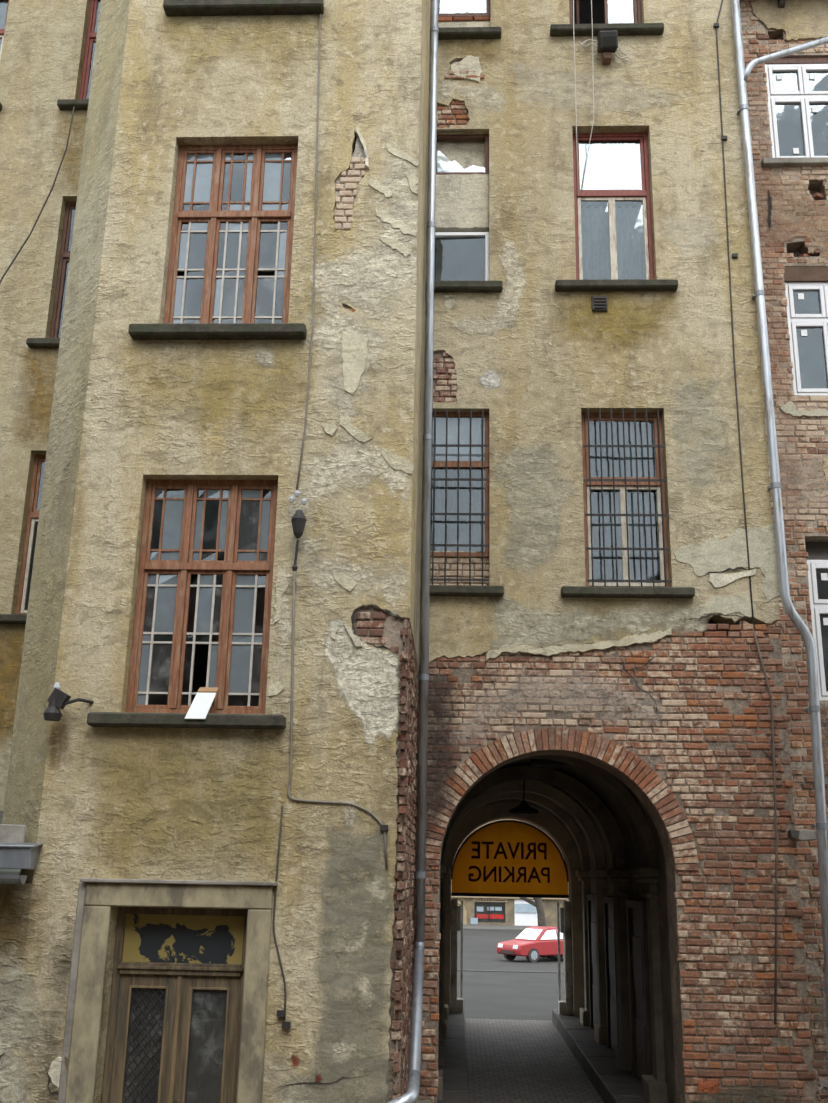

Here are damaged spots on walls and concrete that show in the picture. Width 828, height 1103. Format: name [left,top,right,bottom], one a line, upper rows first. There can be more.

spalling [768,31,784,40]
peeling [437,55,506,133]
peeling [779,401,828,417]
flaking render [268,128,814,1103]